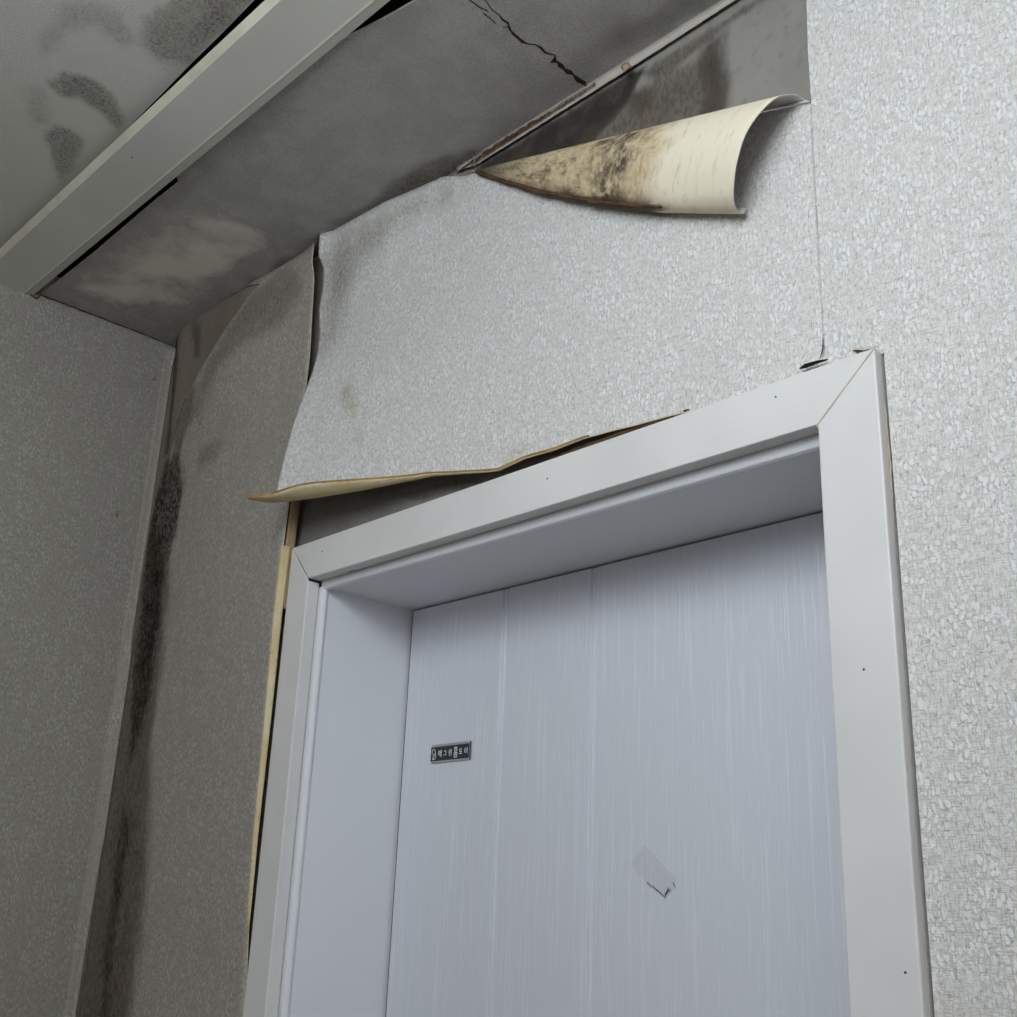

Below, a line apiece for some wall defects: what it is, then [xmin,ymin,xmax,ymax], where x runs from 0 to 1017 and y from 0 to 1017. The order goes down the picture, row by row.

crack [469,0,587,86]
flaking render [453,0,811,176]
damp [42,0,721,359]
flaking render [303,424,642,545]
damp [80,456,182,1017]